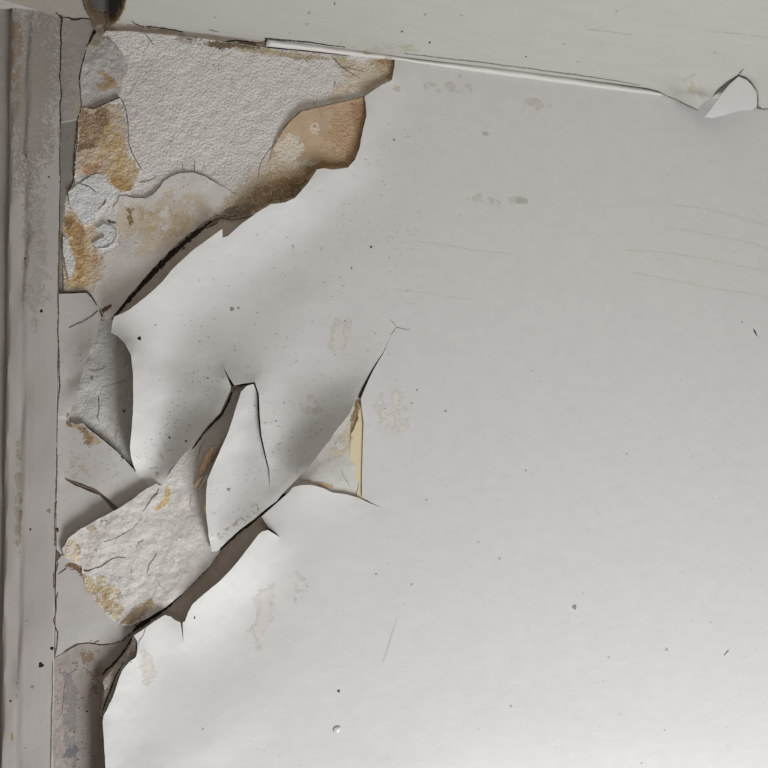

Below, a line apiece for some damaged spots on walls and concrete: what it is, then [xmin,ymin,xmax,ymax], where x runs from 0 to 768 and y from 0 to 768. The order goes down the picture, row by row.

crack [210,30,363,78]
crack [409,54,636,85]
peeling [704,76,757,118]
crack [738,69,768,110]
leakage [10,0,420,333]
spalling [56,19,394,626]
spalling [100,636,136,717]